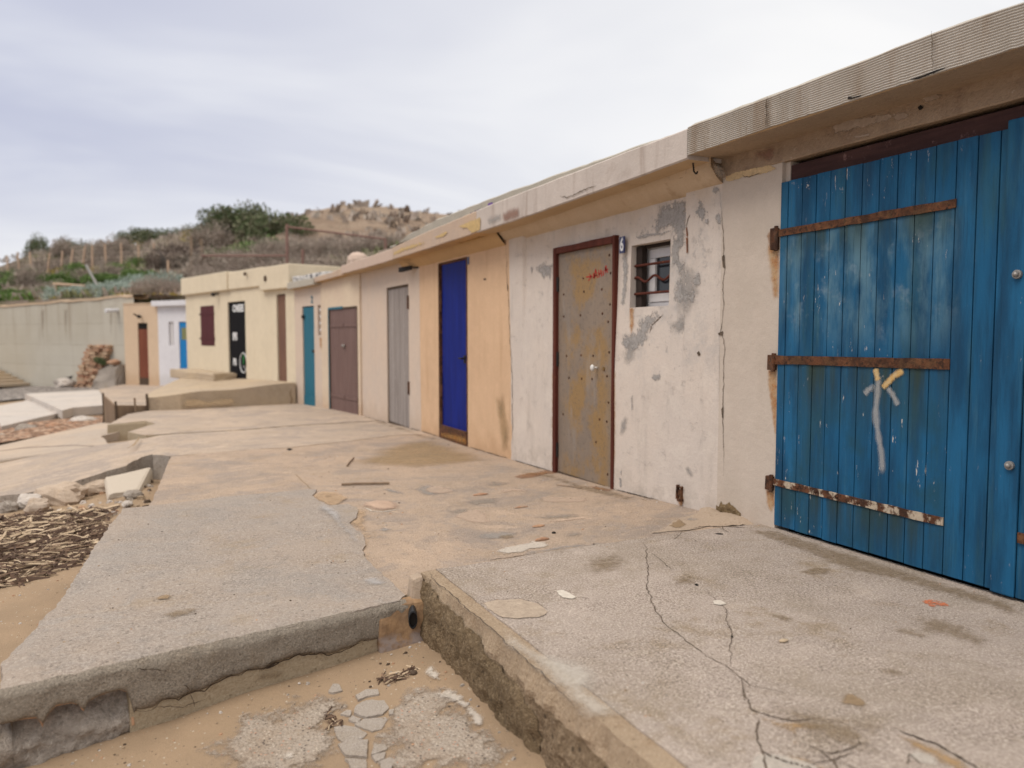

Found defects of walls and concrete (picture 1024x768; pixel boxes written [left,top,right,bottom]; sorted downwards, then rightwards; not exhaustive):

peeling [713,165,775,193]
peeling [637,200,720,308]
peeling [623,312,661,359]
crack [717,201,725,468]
rust [769,371,777,424]
crack [643,543,861,768]
spalling [0,690,135,768]
peeling [334,689,394,768]